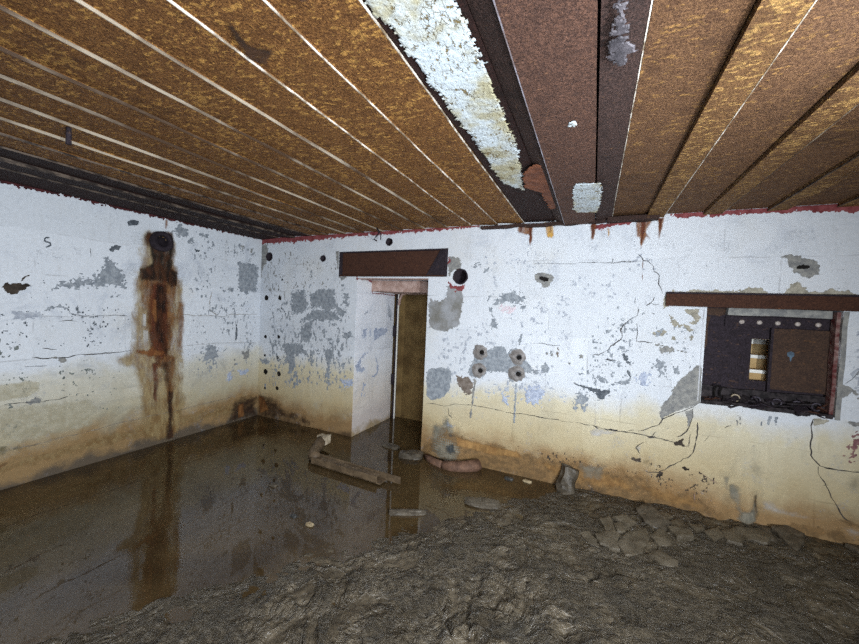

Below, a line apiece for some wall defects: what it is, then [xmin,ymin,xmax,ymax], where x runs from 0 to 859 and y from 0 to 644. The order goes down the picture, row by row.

peeling [364,0,525,190]
peeling [0,245,127,358]
peeling [51,356,100,396]
corrosion [120,220,184,439]
damp [232,396,306,422]
peeling [171,224,395,397]
crack [430,403,718,502]
peeling [426,241,768,426]
corrosion [637,218,664,246]
damp [726,478,759,524]
spalling [781,254,856,295]
crack [810,420,859,522]